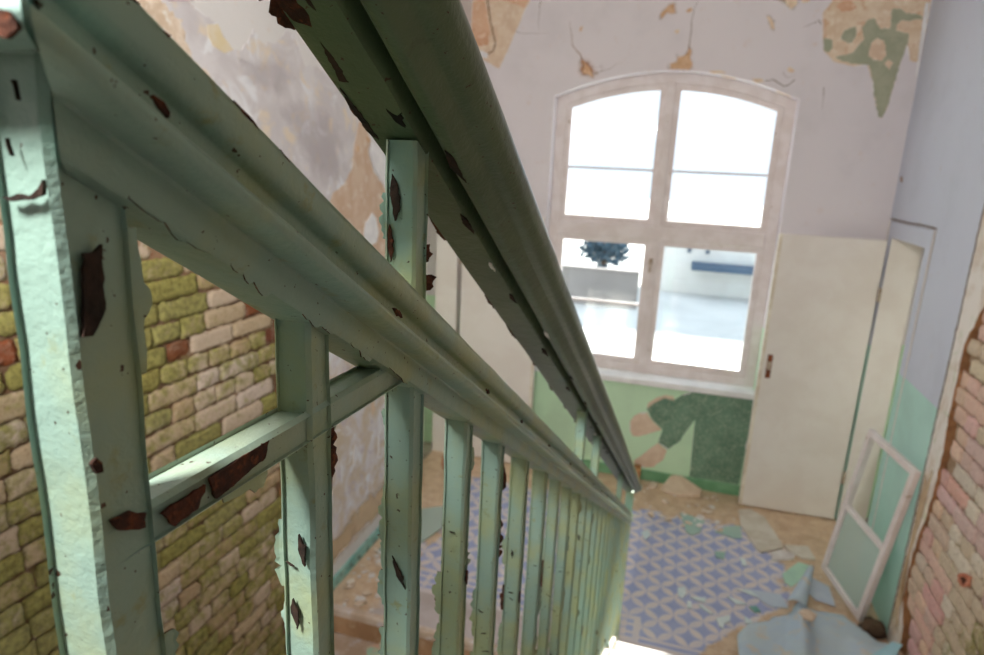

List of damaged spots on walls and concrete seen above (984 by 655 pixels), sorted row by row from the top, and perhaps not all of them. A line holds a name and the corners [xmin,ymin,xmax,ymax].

corrosion [275,0,316,27]
peeling [471,0,530,68]
crack [570,27,618,78]
peeling [803,0,933,118]
peeling [137,0,386,258]
flaking render [127,227,277,474]
flaking render [0,210,60,655]
corrosion [108,510,147,531]
corrosion [159,440,269,527]
flaking render [155,462,287,655]
peeling [630,392,753,485]
flaking render [906,313,984,655]